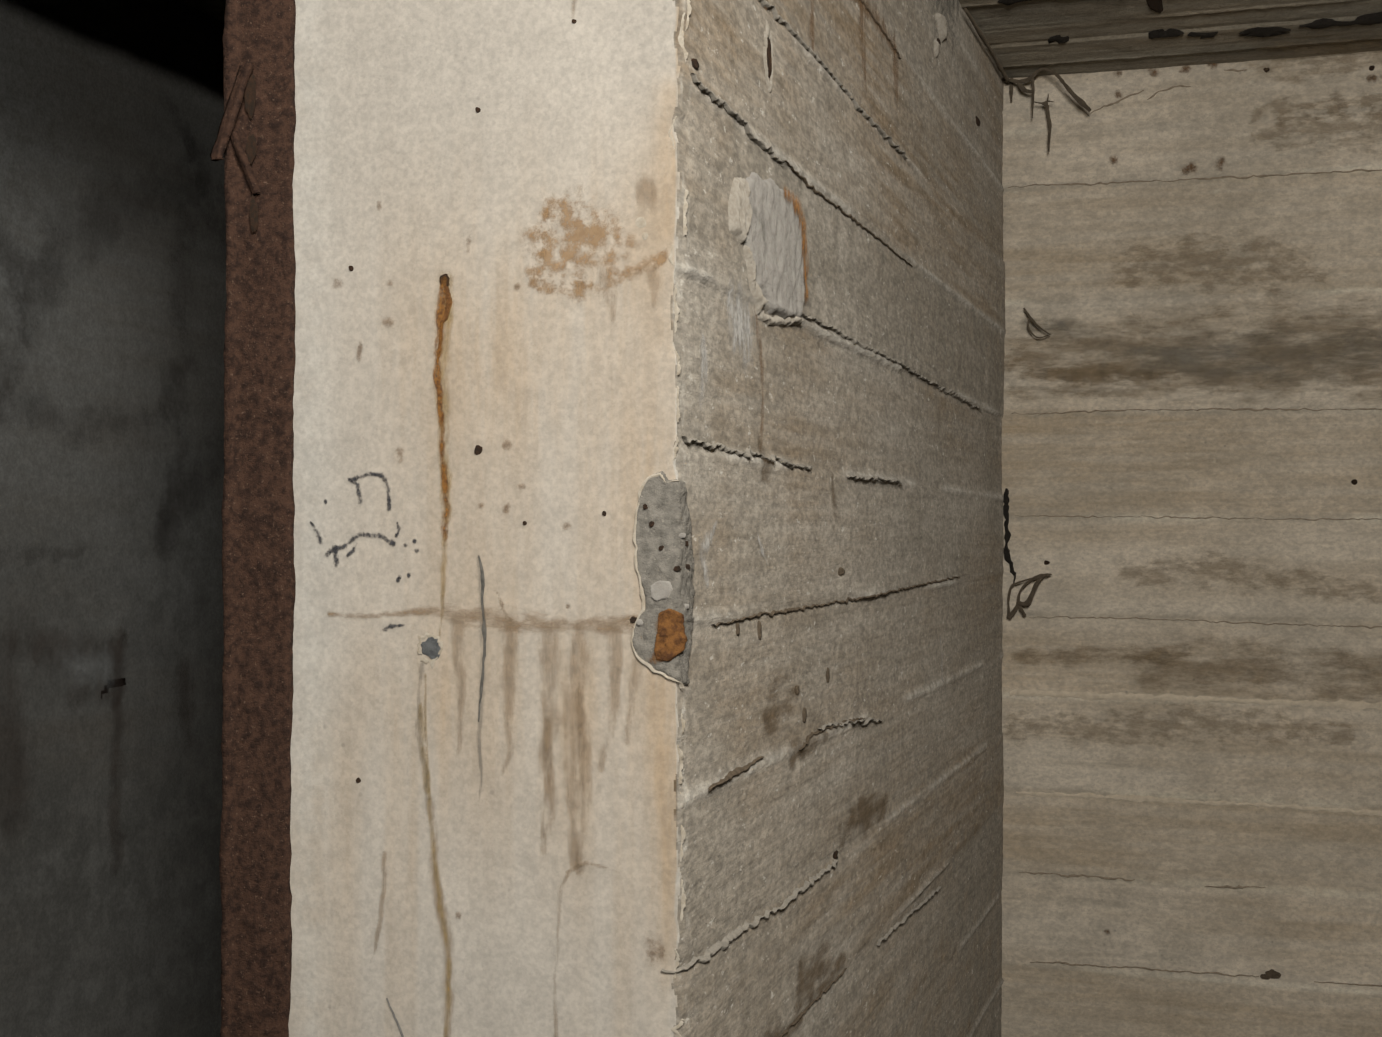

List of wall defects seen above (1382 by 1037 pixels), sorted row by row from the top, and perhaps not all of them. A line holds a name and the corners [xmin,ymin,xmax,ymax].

flaking render [678,0,692,62]
flaking render [669,189,689,266]
spalling [728,172,808,327]
rust [433,274,453,539]
flaking render [630,285,695,688]
crack [1003,488,1381,583]